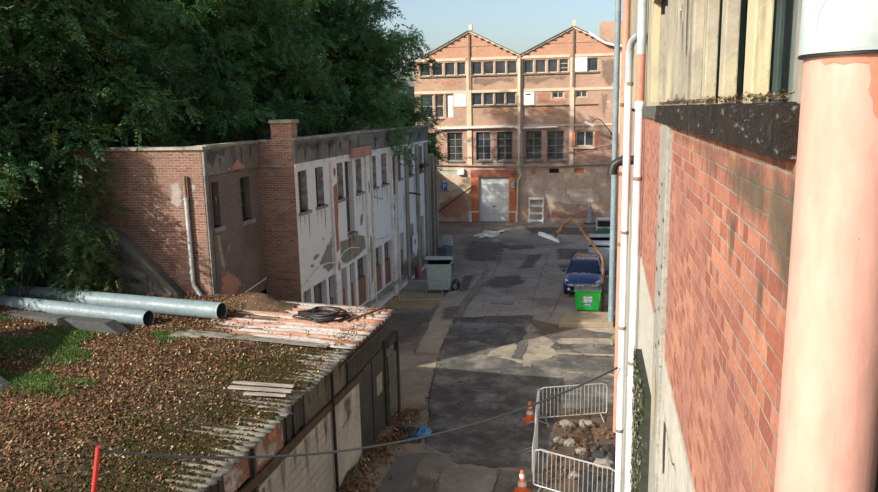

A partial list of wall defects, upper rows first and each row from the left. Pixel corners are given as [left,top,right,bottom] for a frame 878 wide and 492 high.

peeling [808,0,878,118]
peeling [311,169,373,283]
peeling [440,179,467,218]
crack [421,346,443,448]